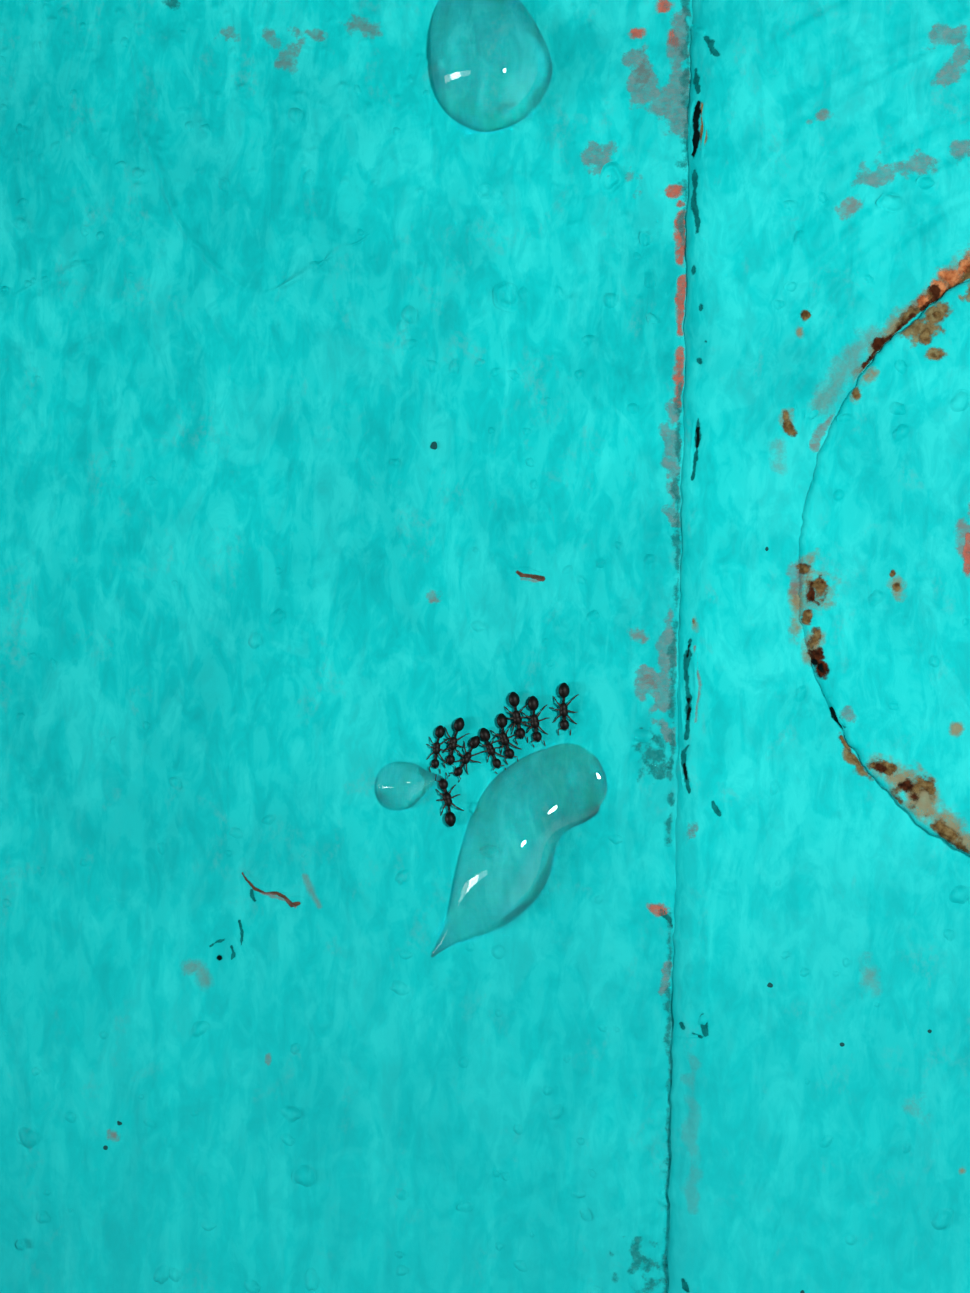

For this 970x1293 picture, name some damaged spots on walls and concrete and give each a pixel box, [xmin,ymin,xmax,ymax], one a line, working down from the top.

crack [684,15,720,233]
corrosion [797,310,811,336]
corrosion [852,255,970,399]
corrosion [783,410,798,436]
corrosion [790,558,830,679]
crack [676,638,721,817]
corrosion [839,735,970,854]